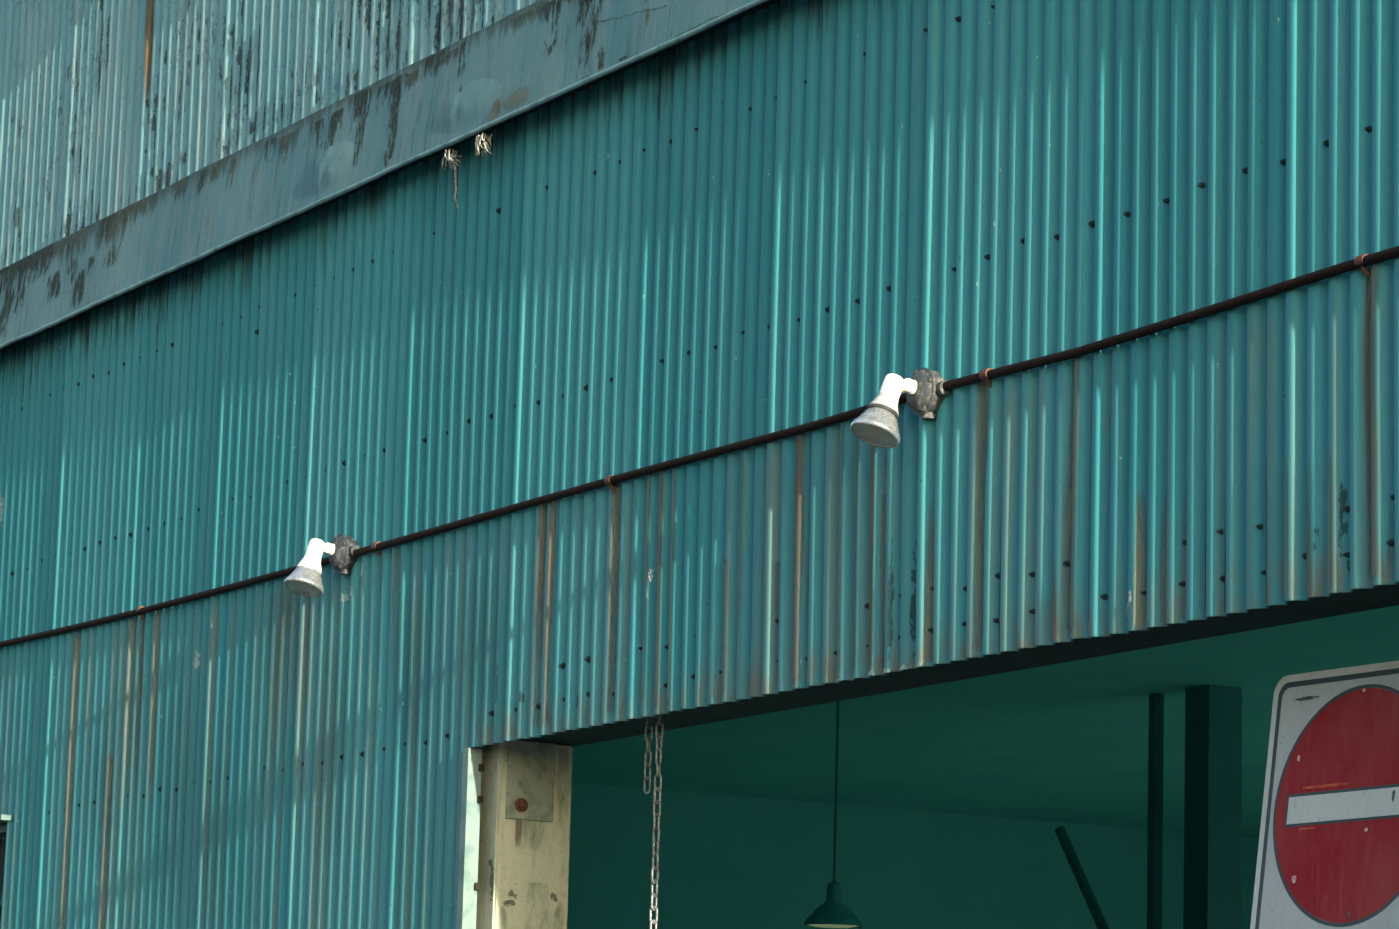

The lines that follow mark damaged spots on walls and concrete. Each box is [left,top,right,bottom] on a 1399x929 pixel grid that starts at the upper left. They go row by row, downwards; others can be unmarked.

peeling [4,178,35,265]
peeling [53,0,110,239]
peeling [120,46,186,205]
peeling [218,0,292,152]
peeling [331,0,410,95]
peeling [427,0,494,51]
corrosion [837,422,894,672]
corrosion [910,540,934,662]
corrosion [975,381,1001,648]
corrosion [1365,266,1378,578]
corrosion [60,633,82,929]
corrosion [100,610,161,929]